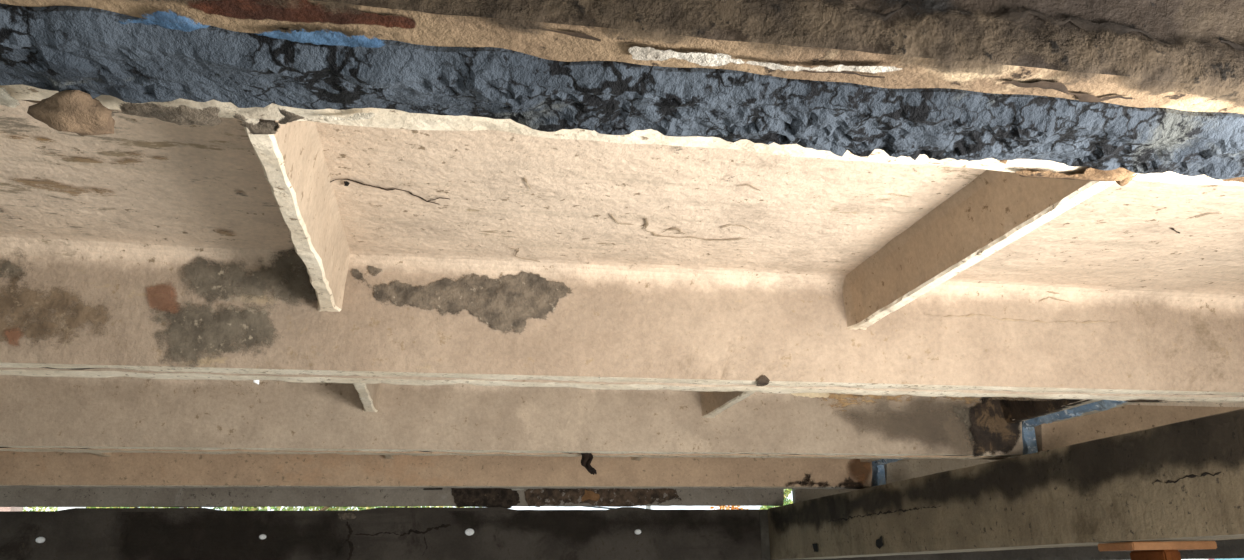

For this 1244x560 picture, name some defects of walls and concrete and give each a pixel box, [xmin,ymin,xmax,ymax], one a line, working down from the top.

spalling [320,0,1244,107]
crack [330,179,449,205]
leakage [0,256,109,346]
leakage [146,250,318,370]
spalling [423,488,682,508]
leakage [771,397,1244,531]